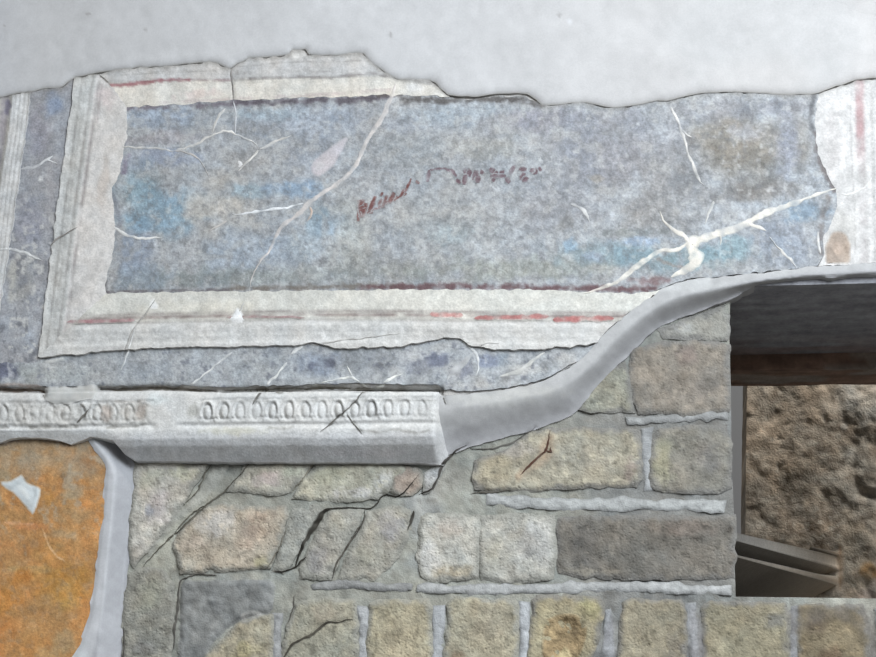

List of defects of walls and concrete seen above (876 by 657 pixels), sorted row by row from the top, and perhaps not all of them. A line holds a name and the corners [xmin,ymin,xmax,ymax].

crack [124,68,290,176]
crack [114,227,161,240]
crack [210,83,396,335]
crack [585,107,872,293]
crack [121,300,155,369]
crack [182,352,232,387]
crack [311,366,403,433]
peeling [0,474,41,515]
crack [267,429,553,578]
crack [284,595,352,657]